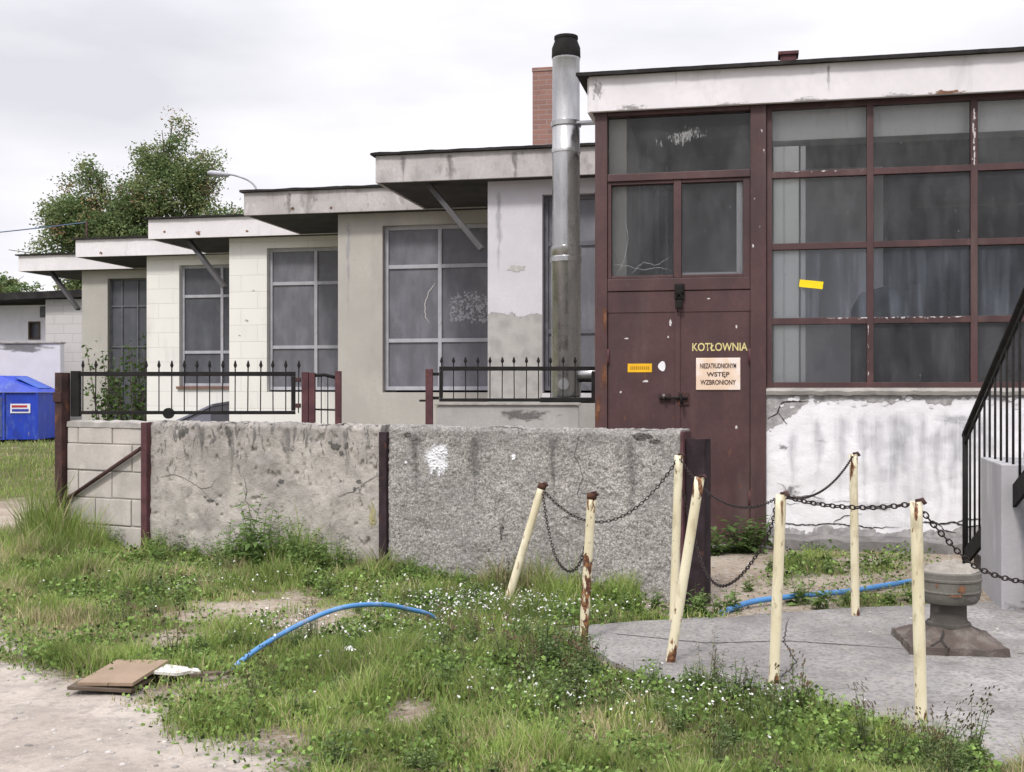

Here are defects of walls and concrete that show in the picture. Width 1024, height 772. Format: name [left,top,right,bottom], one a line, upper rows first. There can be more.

crack [768,401,810,424]
peeling [766,394,1024,432]
crack [162,466,262,513]
peeling [766,524,978,539]